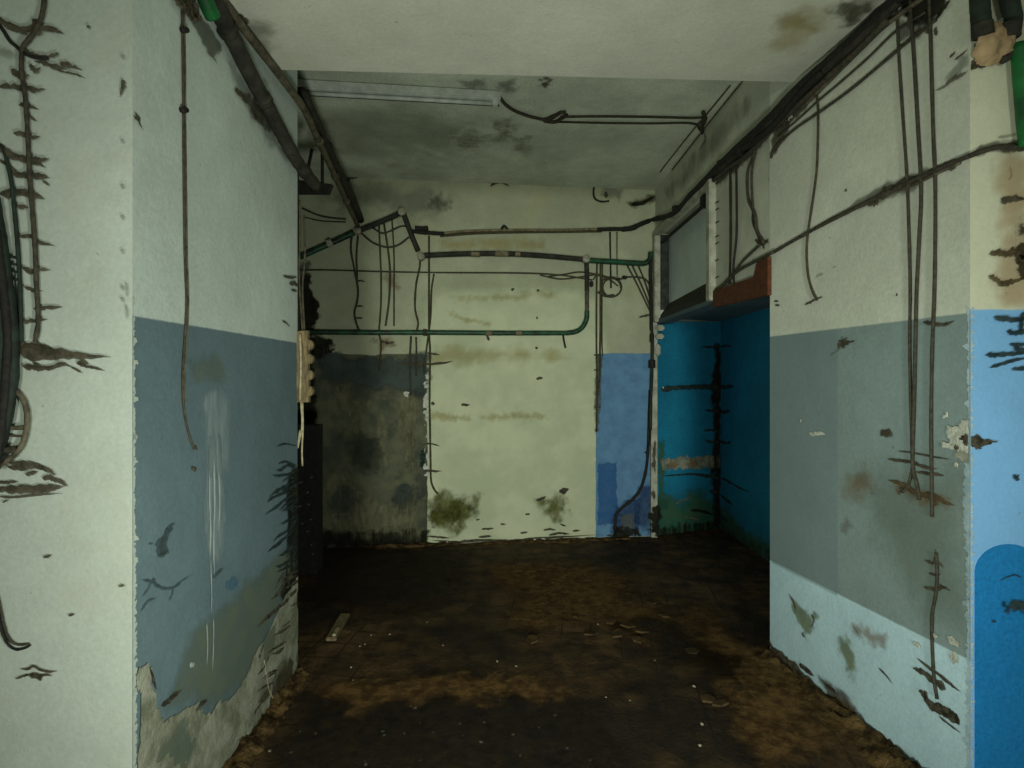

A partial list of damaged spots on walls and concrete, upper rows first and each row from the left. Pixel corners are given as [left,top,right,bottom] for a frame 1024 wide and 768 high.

water stain [837,3,871,26]
corrosion [1001,195,1024,205]
corrosion [989,224,1024,287]
spalling [661,455,720,476]
flaking render [119,296,298,768]
water stain [323,484,478,548]
water stain [539,498,564,522]
spalling [919,307,997,768]
water stain [174,464,293,702]